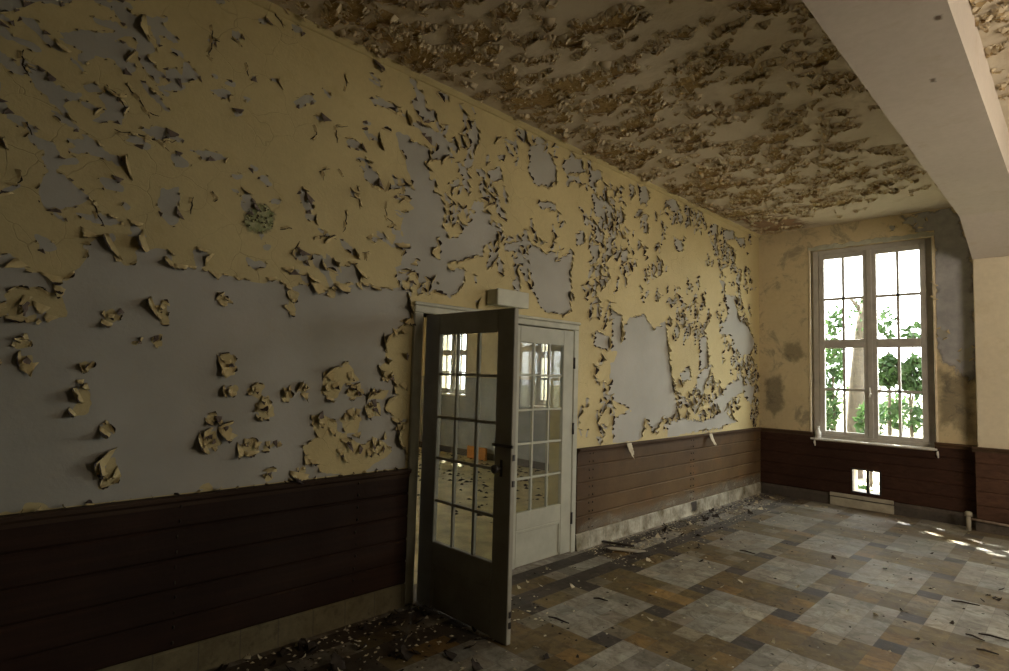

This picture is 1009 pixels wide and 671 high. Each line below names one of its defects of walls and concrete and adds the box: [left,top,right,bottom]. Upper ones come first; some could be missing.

peeling [969,0,1009,100]
mould [244,204,275,234]
peeling [0,0,936,514]